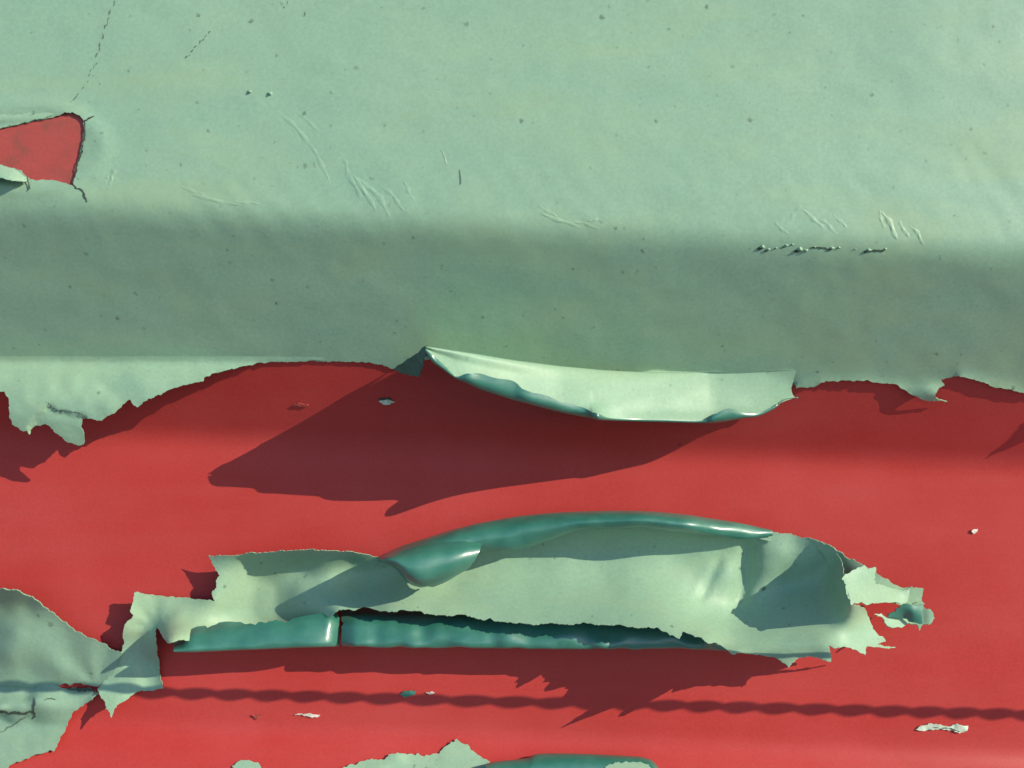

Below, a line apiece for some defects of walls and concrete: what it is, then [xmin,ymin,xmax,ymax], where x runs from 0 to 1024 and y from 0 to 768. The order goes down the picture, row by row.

peeling [0,112,86,190]
peeling [0,356,325,446]
peeling [393,346,798,423]
peeling [0,511,934,768]
peeling [915,723,968,733]